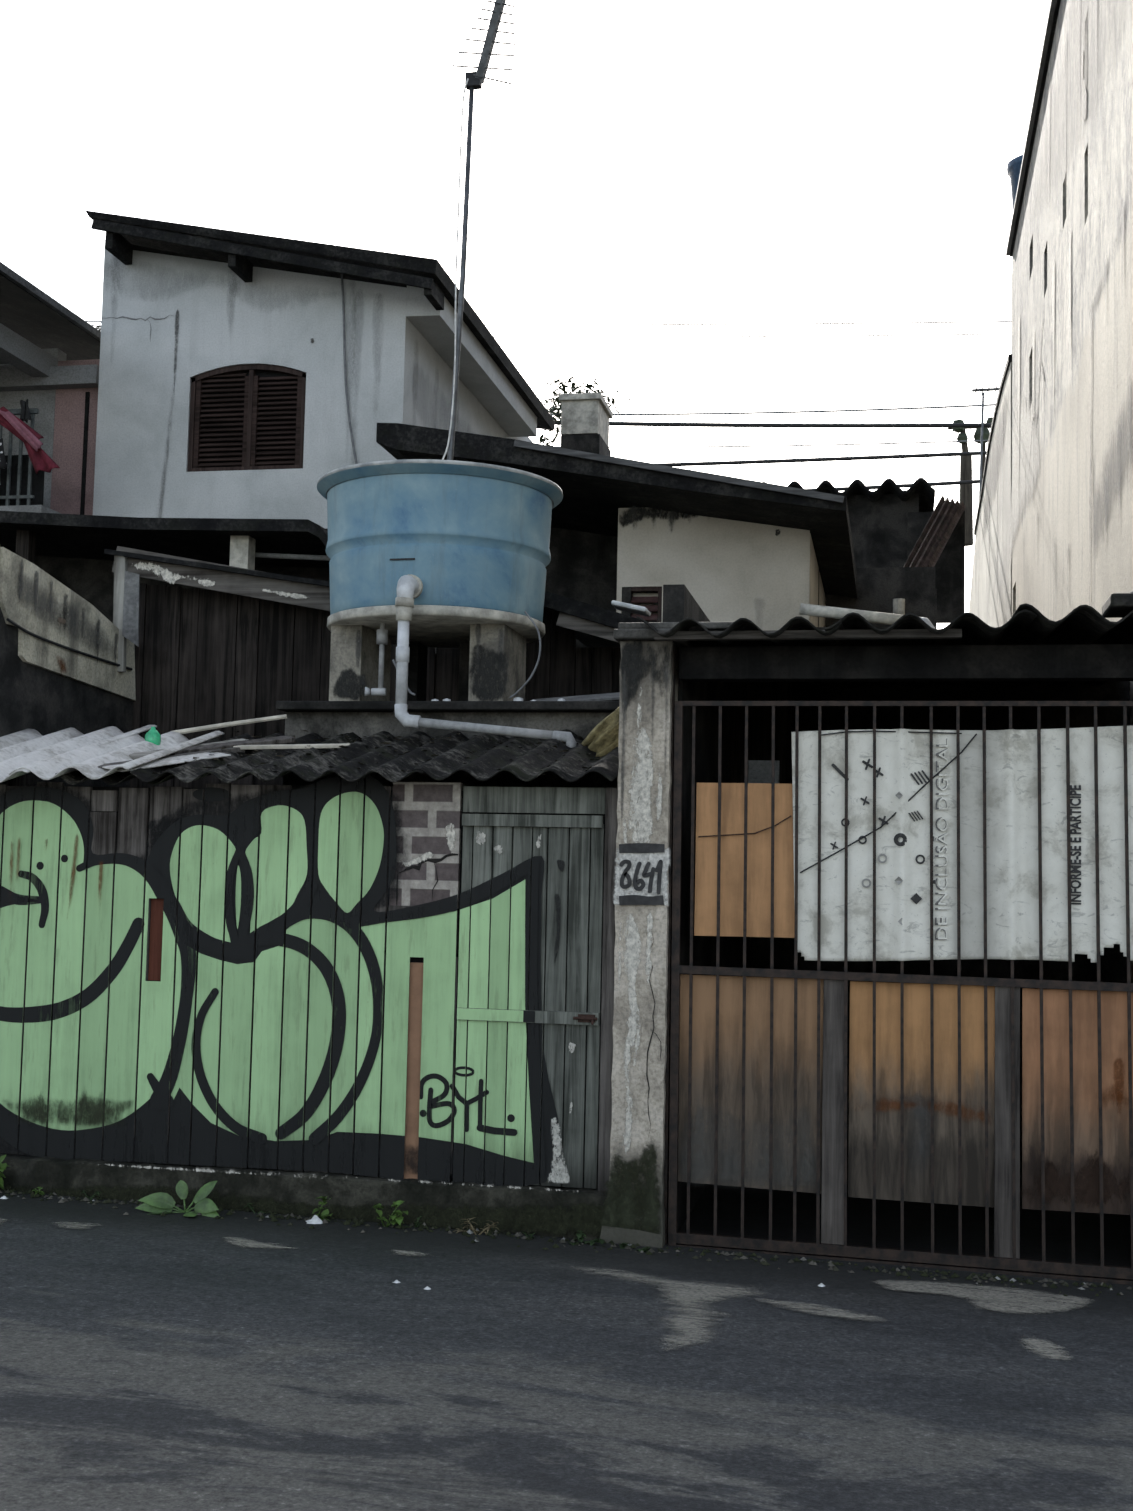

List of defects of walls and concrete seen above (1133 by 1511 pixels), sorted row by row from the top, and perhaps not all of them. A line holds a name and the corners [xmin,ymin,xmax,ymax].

damp [1090,395,1131,541]
damp [18,560,118,661]
peeling [476,831,503,854]
peeling [98,1164,272,1175]
peeling [482,1102,578,1192]